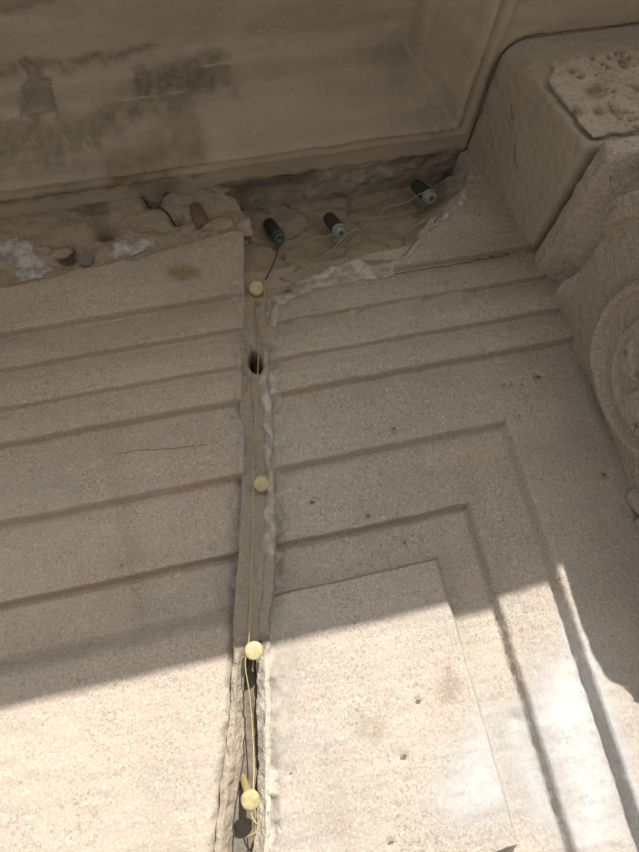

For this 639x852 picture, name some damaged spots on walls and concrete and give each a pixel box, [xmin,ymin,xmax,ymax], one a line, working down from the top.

spalling [0,171,482,351]
crack [212,210,511,852]